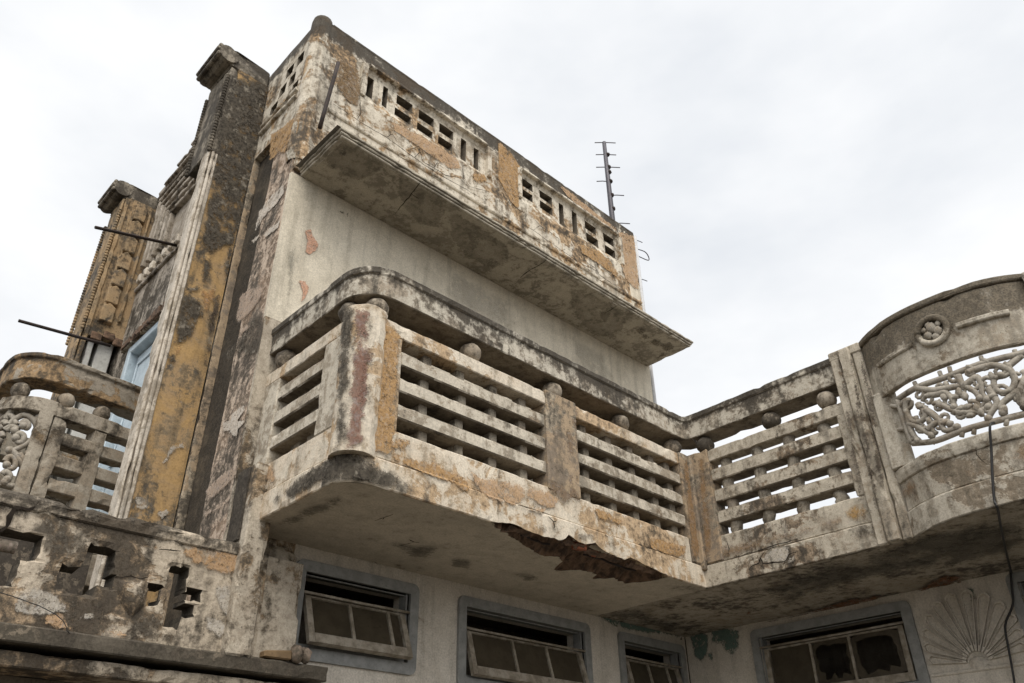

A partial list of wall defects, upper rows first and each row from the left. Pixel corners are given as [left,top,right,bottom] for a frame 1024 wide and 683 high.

leakage [167,75,269,368]
peeling [305,229,318,254]
crack [334,96,628,314]
peeling [473,143,519,207]
peeling [561,186,640,290]
rust [346,309,373,448]
peeling [375,322,559,513]
spalling [492,522,666,584]